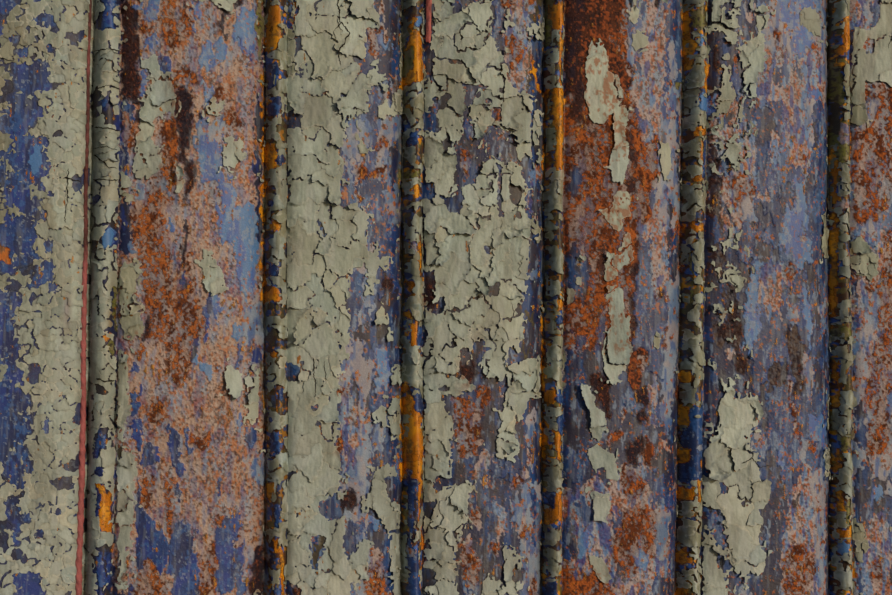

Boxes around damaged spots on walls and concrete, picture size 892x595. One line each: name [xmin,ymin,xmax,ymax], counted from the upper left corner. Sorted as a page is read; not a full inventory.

peeling [0,0,191,595]
rust [121,0,194,101]
rust [128,65,206,385]
peeling [197,97,225,126]
peeling [194,249,241,316]
peeling [218,0,649,595]
rust [563,0,660,423]
peeling [655,0,802,595]
peeling [788,0,892,595]
rust [849,84,892,225]
rust [864,230,892,456]
rust [607,431,657,578]